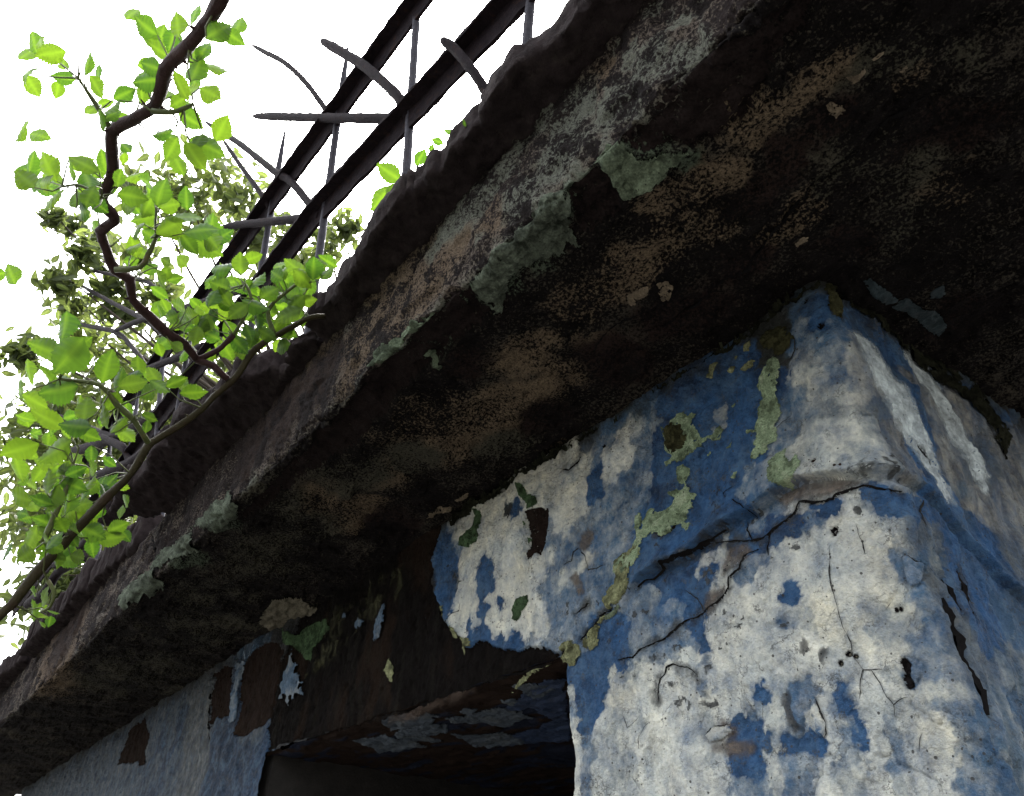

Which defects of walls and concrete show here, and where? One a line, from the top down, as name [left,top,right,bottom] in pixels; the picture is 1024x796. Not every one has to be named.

peeling [656,281,673,302]
peeling [863,278,898,305]
leakage [855,334,950,502]
leakage [905,354,987,492]
spalling [525,507,549,559]
crack [565,445,942,745]
leakage [230,634,270,661]
spalling [208,525,565,754]
crack [930,568,990,716]
hole [904,674,915,689]
spalling [117,716,150,766]